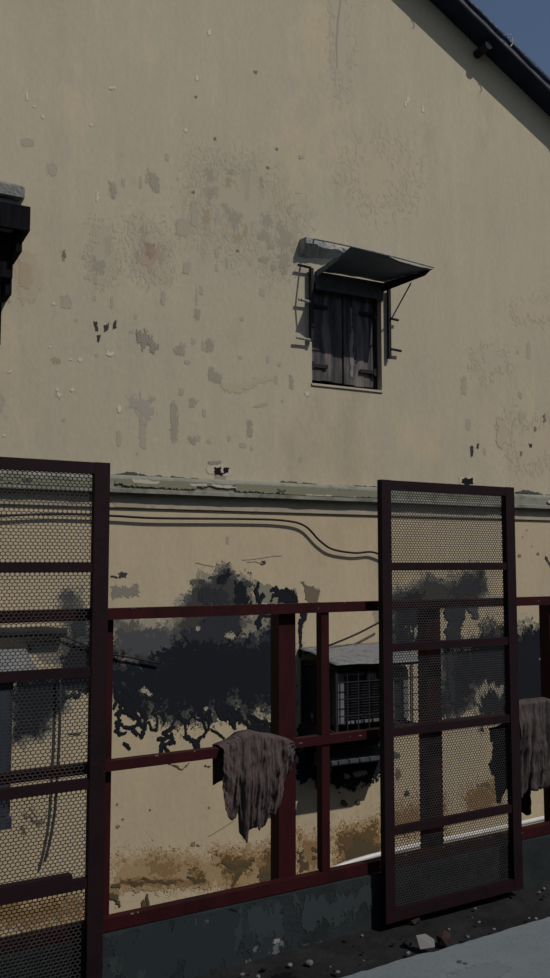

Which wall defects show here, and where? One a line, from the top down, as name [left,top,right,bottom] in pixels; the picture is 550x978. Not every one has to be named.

peeling [134,314,159,354]
peeling [170,388,211,445]
leakage [110,560,308,753]
leakage [392,559,505,734]
mould [517,613,541,699]